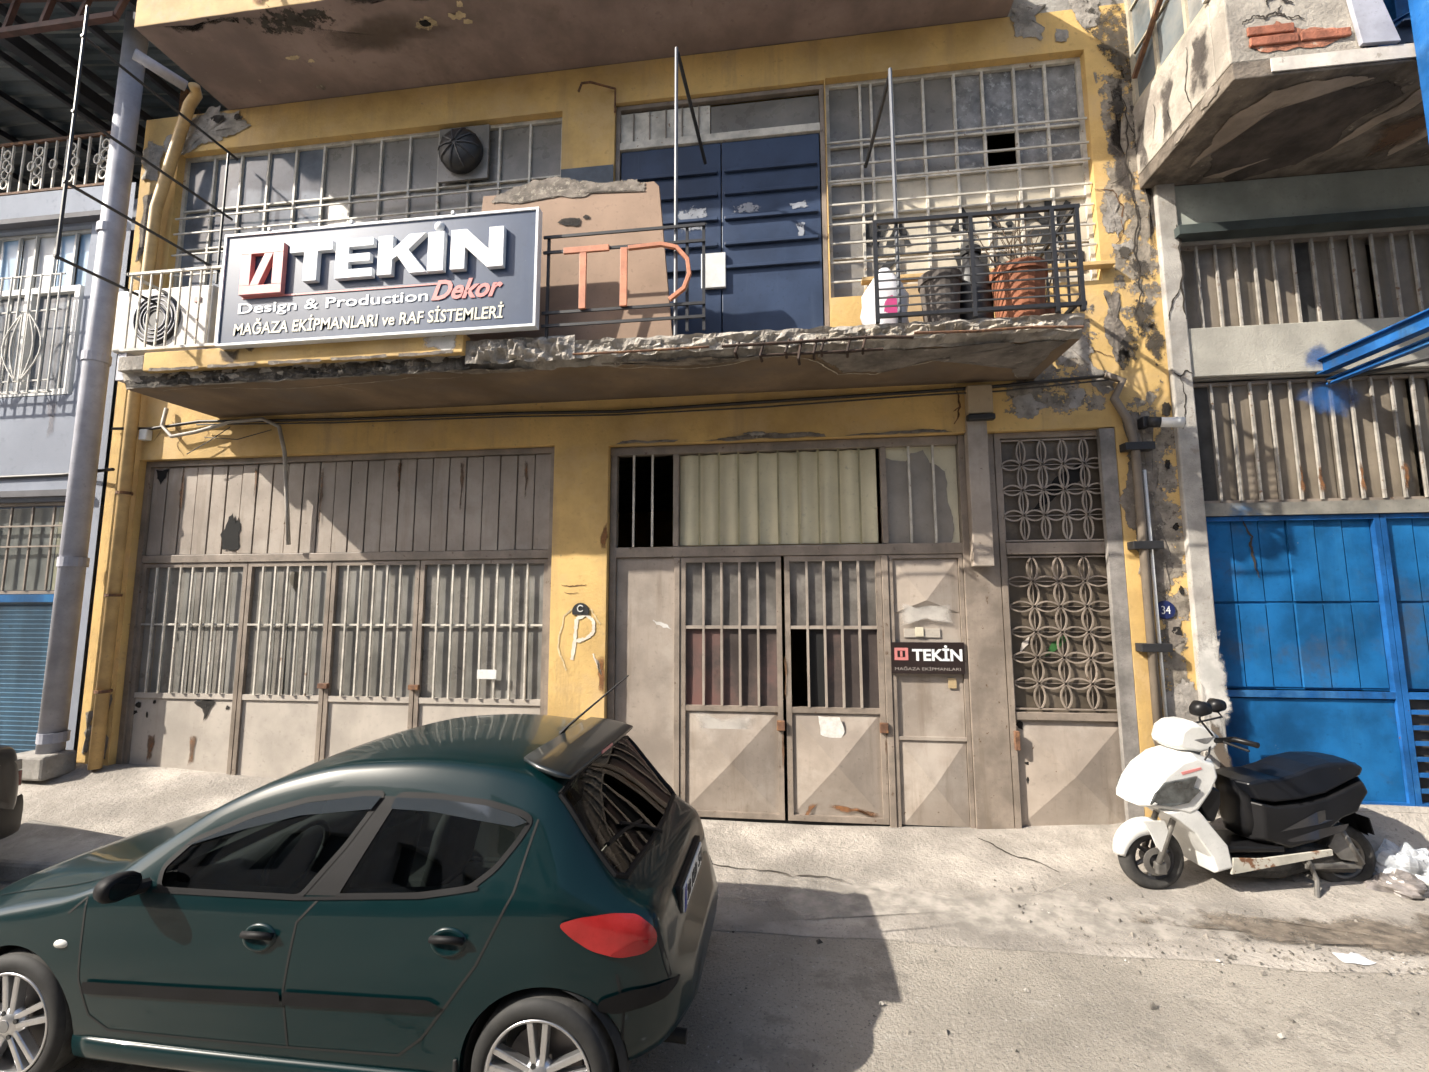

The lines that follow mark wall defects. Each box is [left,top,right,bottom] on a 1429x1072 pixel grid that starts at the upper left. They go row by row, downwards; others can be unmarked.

peeling [416,1,473,31]
spalling [1010,0,1101,42]
crack [1242,0,1305,25]
flaking render [1246,21,1352,53]
peeling [126,66,1162,419]
spalling [706,431,826,441]
peeling [1118,379,1231,736]